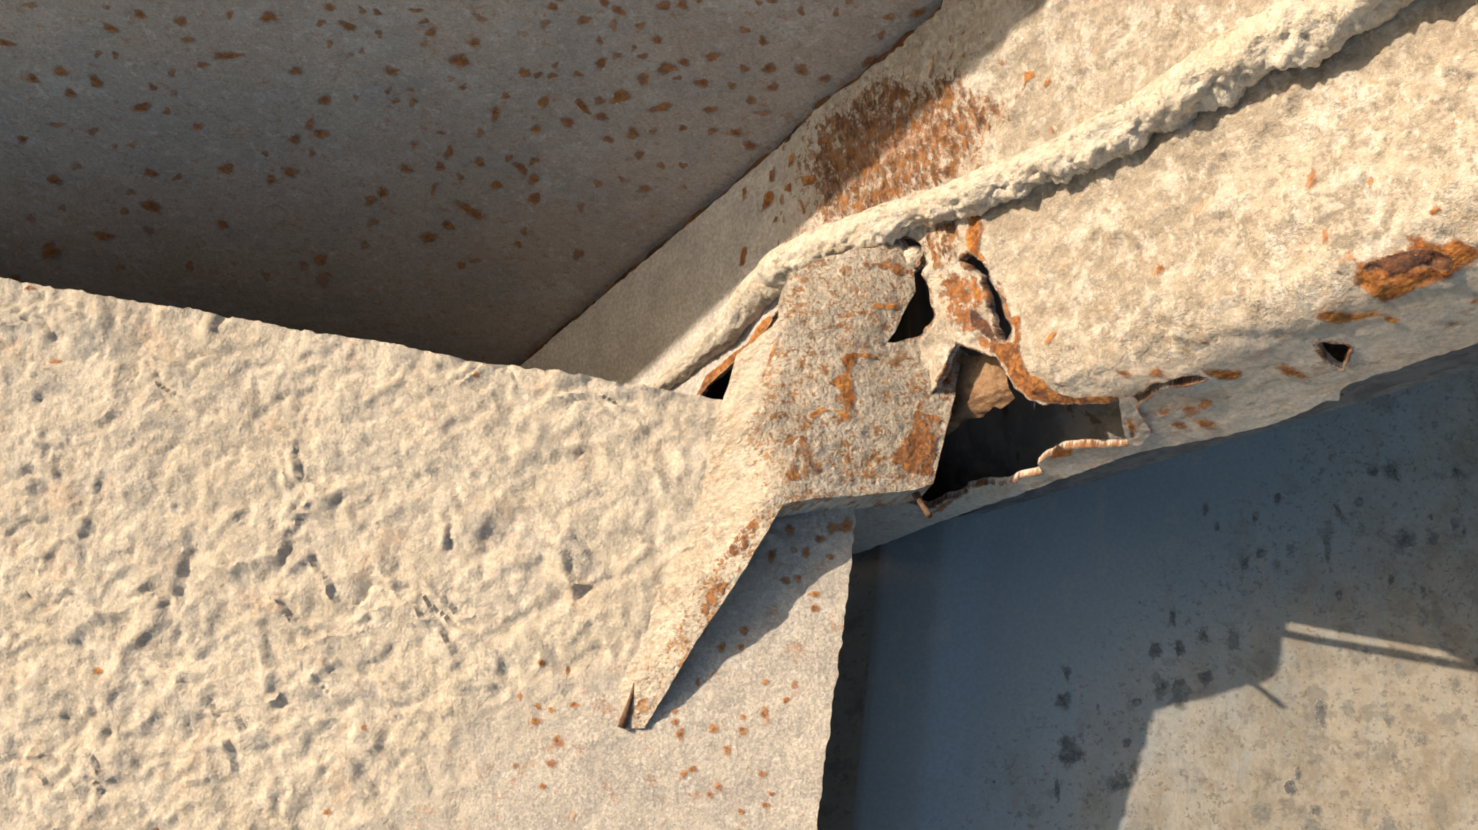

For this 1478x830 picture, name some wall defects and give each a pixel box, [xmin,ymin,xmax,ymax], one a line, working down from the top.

rust [519,0,721,169]
rust [740,7,1049,246]
rust [1315,235,1478,325]
peeling [697,316,772,395]
peeling [1050,445,1073,458]
rust [699,510,764,615]
rust [780,575,820,612]
rust [517,694,579,725]
rust [617,683,634,729]
rust [670,709,684,740]
rust [709,681,797,754]
rust [539,735,563,789]